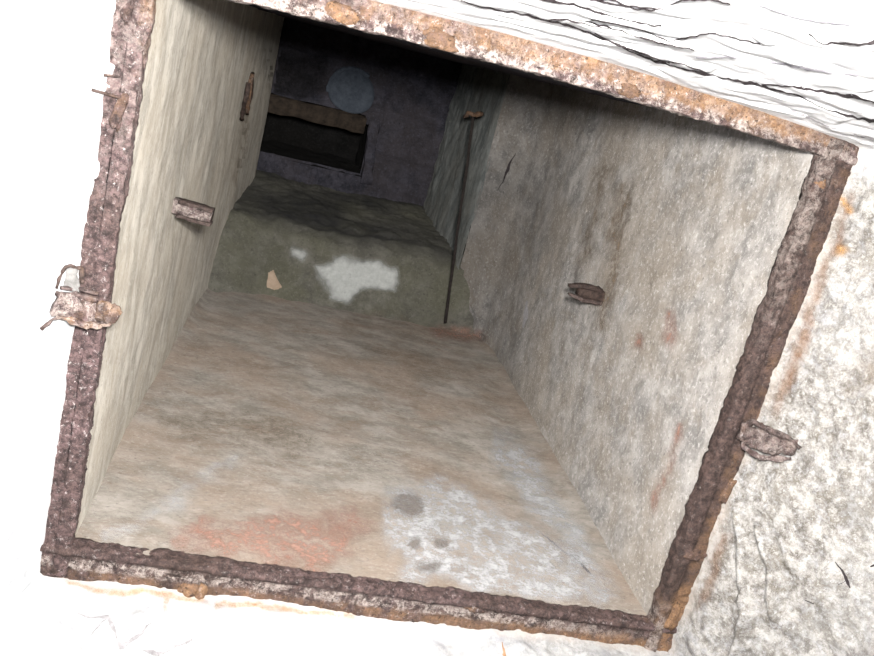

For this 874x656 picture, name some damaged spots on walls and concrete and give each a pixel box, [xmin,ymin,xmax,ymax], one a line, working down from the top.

corrosion [120,1,133,25]
corrosion [324,1,360,25]
corrosion [422,26,459,53]
crack [461,0,874,139]
corrosion [615,83,641,98]
corrosion [108,93,129,132]
corrosion [719,478,737,504]
corrosion [177,583,208,600]
crack [75,613,193,656]